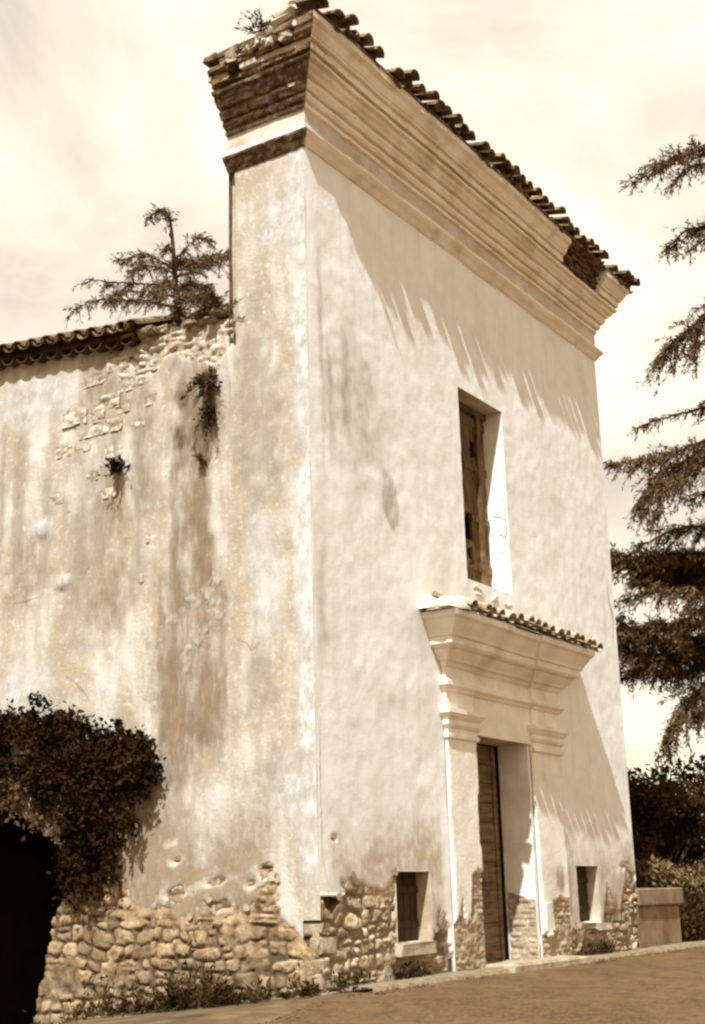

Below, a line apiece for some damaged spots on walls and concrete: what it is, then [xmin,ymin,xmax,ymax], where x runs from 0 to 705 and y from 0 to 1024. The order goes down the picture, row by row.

flaking render [56,340,163,459]
flaking render [86,468,116,500]
leakage [159,414,225,783]
flaking render [150,875,250,950]
flaking render [248,862,281,907]
flaking render [295,872,375,996]
flaking render [454,869,487,971]
flaking render [507,892,591,960]